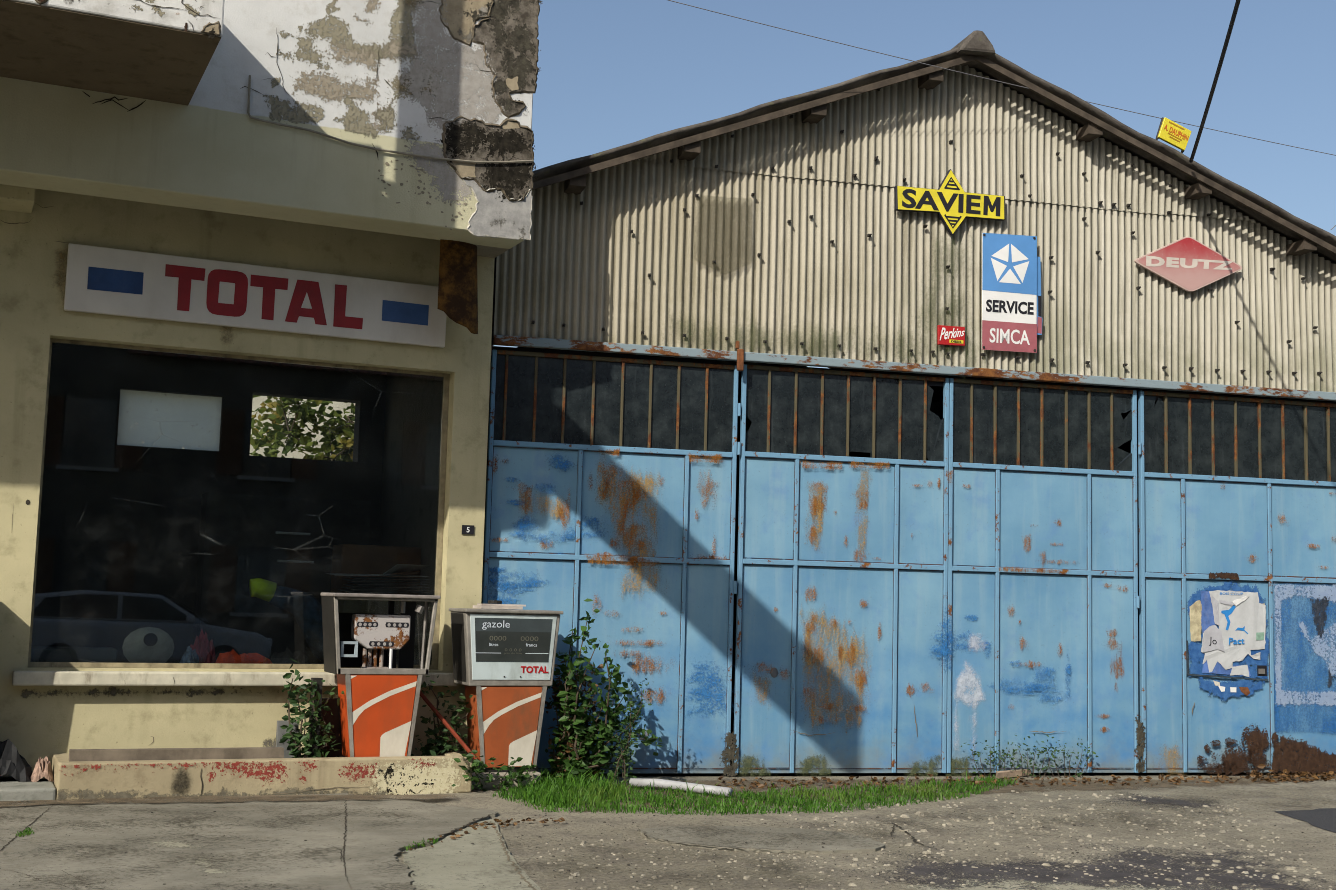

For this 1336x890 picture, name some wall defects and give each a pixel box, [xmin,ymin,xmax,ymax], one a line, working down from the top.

peeling [129,0,165,16]
spalling [185,4,221,39]
peeling [263,0,542,240]
rust [518,482,570,526]
rust [587,448,662,597]
rust [754,586,881,733]
peeling [1187,580,1336,734]
crack [1,805,92,888]
crack [260,787,360,890]
crack [402,812,536,890]